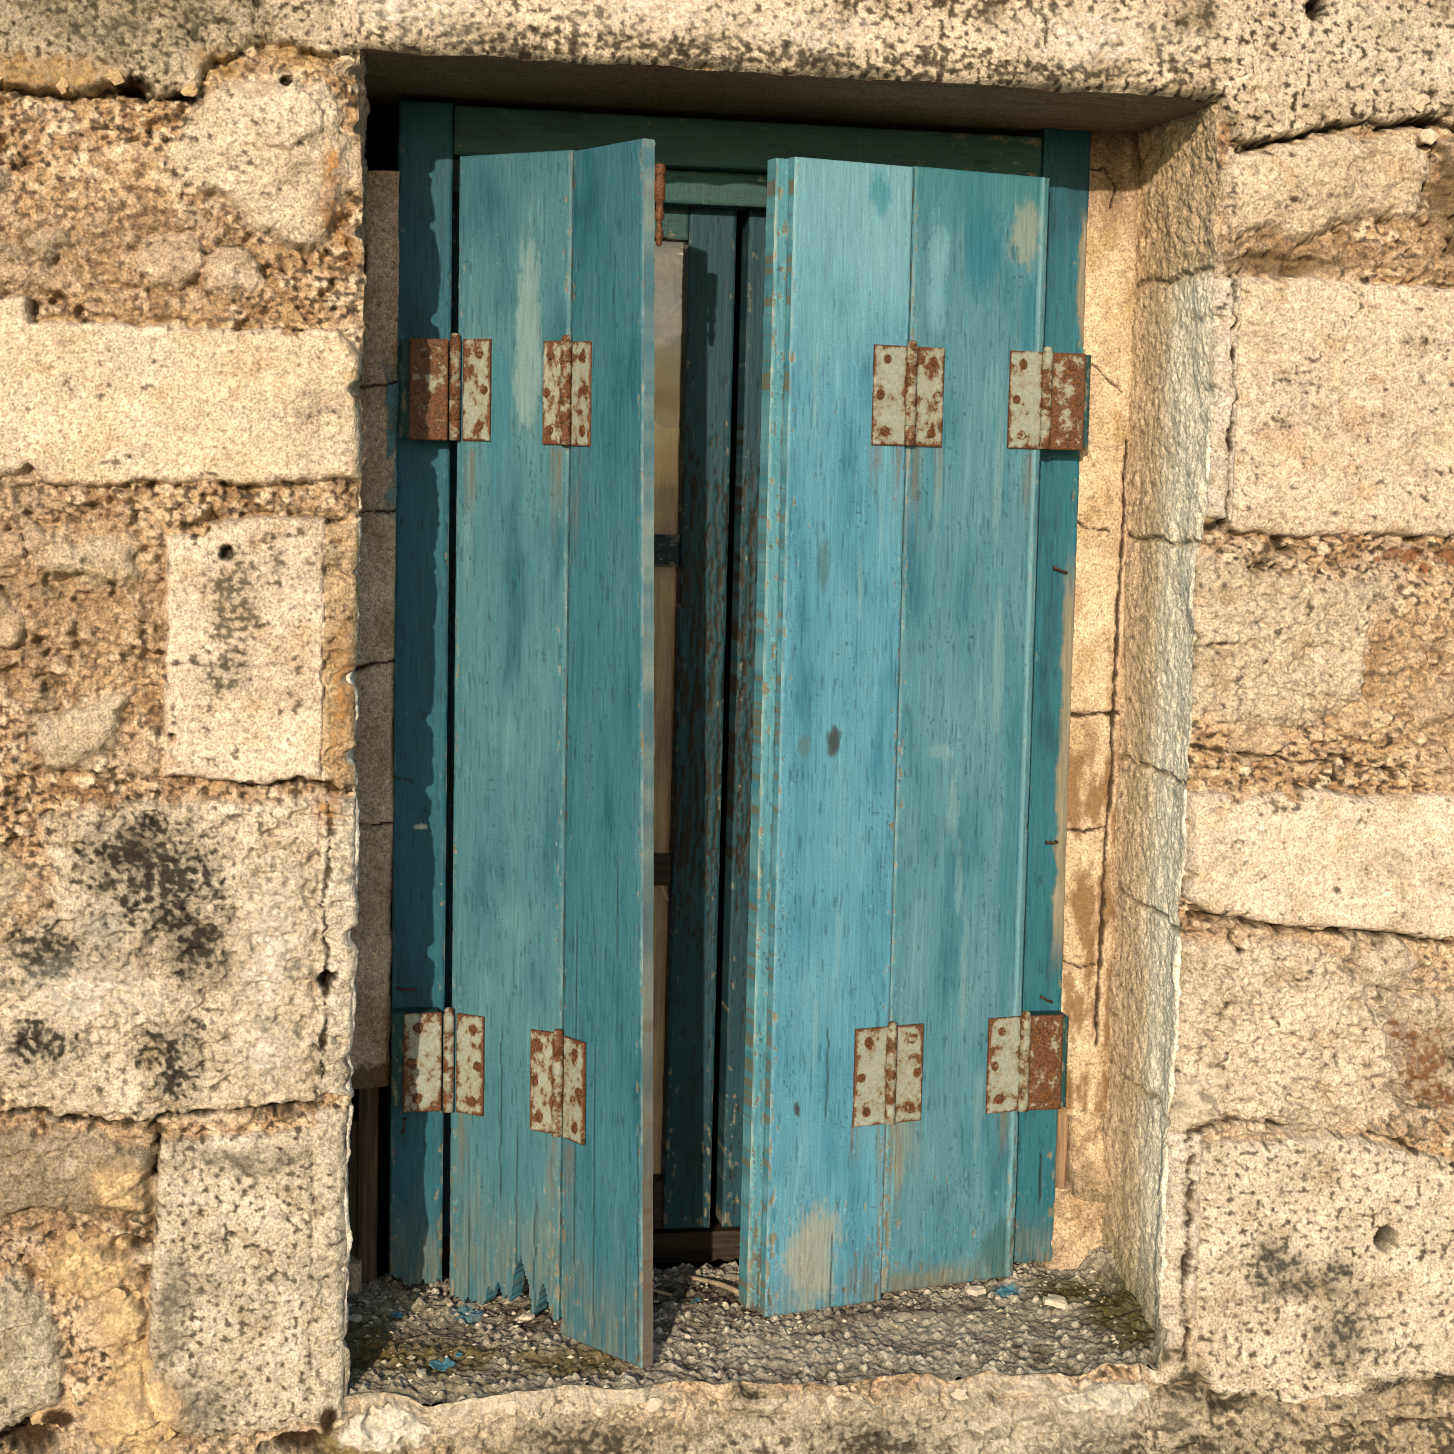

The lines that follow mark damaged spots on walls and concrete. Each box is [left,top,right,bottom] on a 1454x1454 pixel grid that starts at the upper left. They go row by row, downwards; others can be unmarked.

crack [1063,440,1128,1045]
damp [7,805,304,1082]
damp [135,1019,204,1116]
crack [1,776,392,1172]